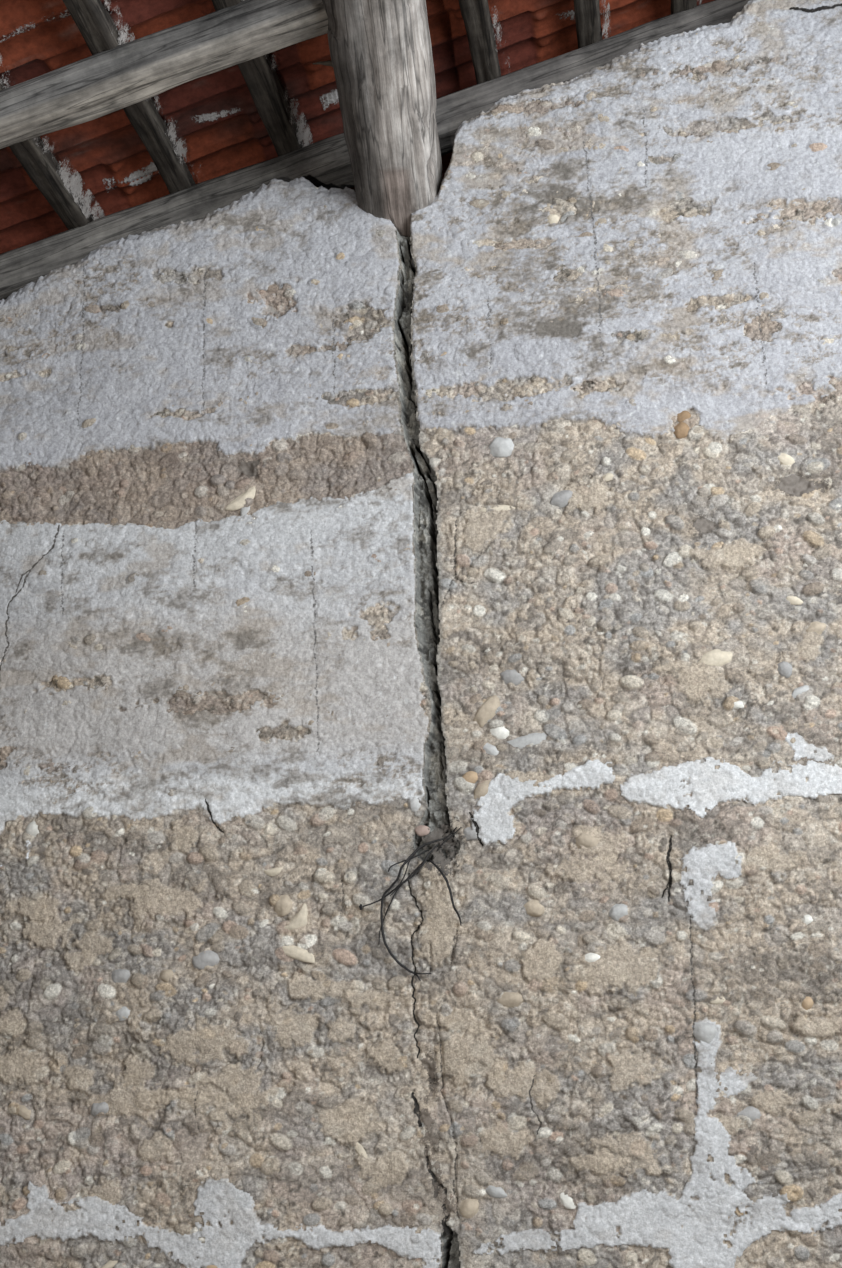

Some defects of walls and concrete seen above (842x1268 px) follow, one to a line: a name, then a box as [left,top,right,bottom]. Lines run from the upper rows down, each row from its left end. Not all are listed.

crack [790,4,842,13]
crack [0,525,60,671]
crack [393,229,484,1268]